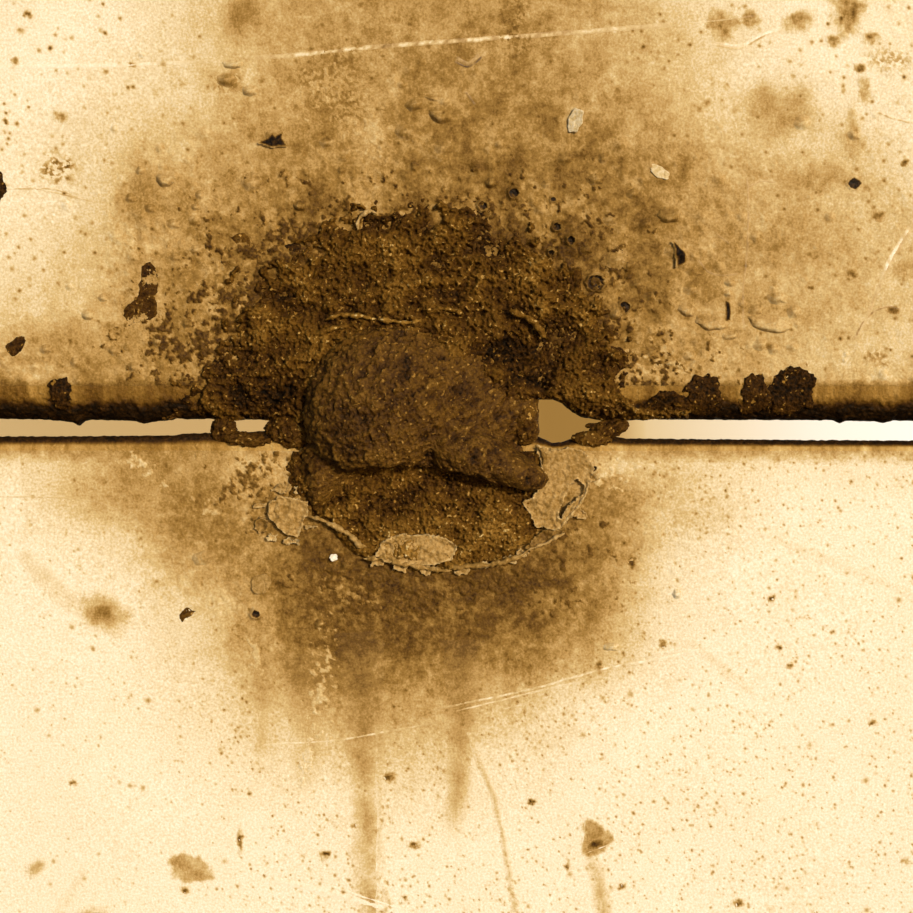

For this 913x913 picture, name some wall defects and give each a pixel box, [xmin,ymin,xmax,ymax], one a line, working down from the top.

corrosion [0,0,913,423]
peeling [253,444,600,576]
corrosion [0,451,913,913]